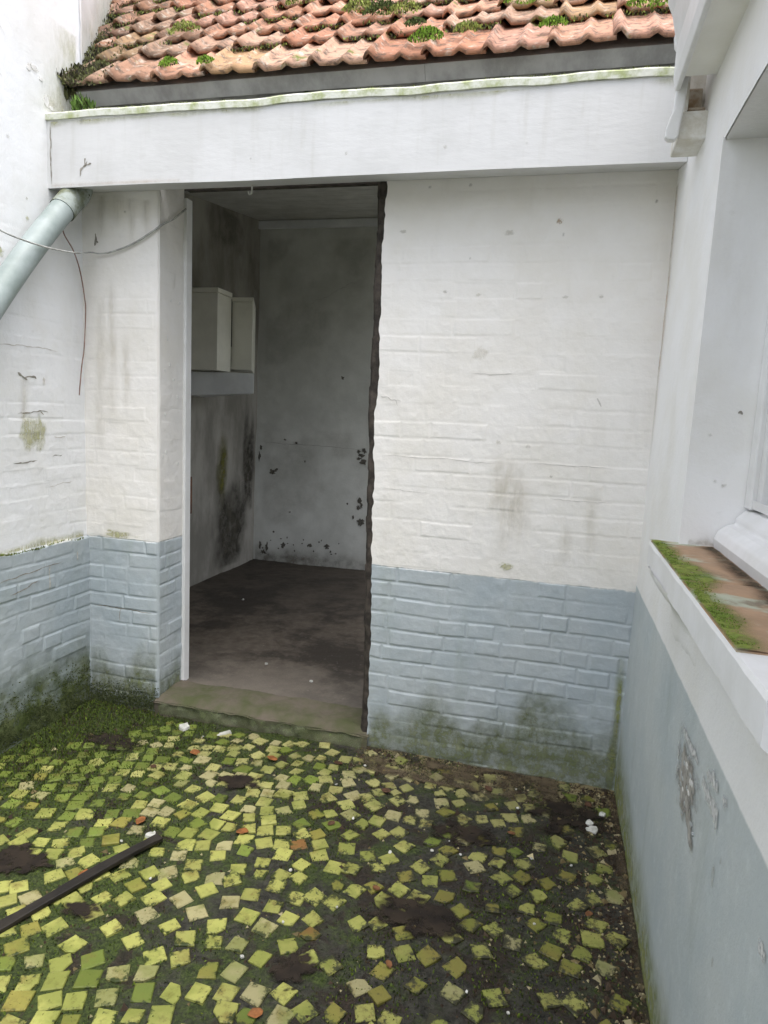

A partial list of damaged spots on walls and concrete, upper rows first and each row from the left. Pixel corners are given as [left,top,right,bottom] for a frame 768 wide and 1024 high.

water stain [219,431,254,565]
flaking render [678,743,699,849]